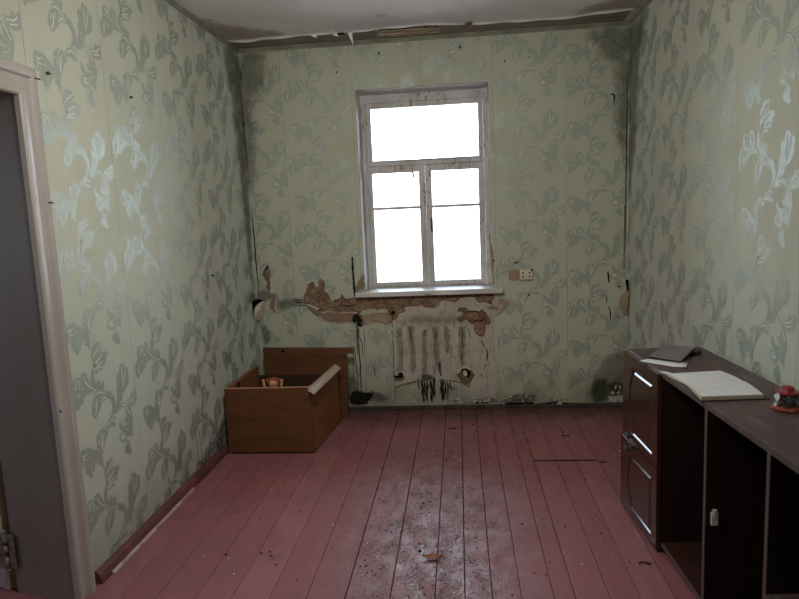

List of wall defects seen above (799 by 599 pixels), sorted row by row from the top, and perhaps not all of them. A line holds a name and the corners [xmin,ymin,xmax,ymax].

peeling [306,304,395,327]
flaking render [457,307,491,337]
water stain [418,363,455,402]